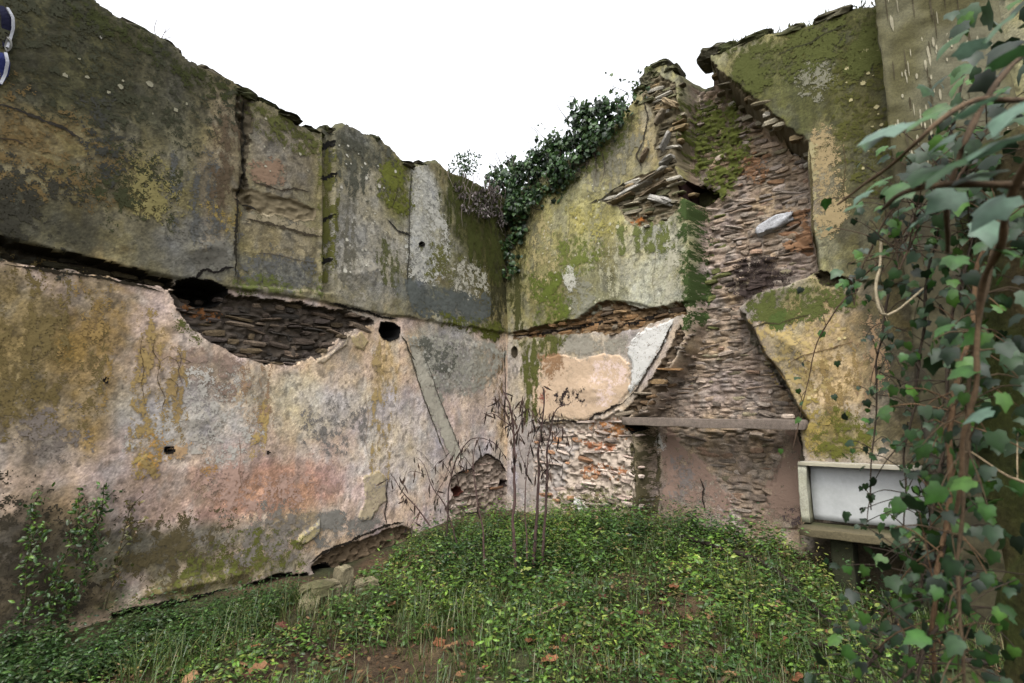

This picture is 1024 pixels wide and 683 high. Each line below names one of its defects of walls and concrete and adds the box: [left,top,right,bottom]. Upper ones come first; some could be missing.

water stain [0,0,245,464]
crack [0,98,337,292]
water stain [0,345,368,651]
spalling [0,235,374,366]
spalling [250,470,416,584]
spalling [403,300,687,520]
water stain [488,202,626,441]
spalling [600,72,700,228]
peeling [740,312,806,525]
spalling [711,62,851,240]